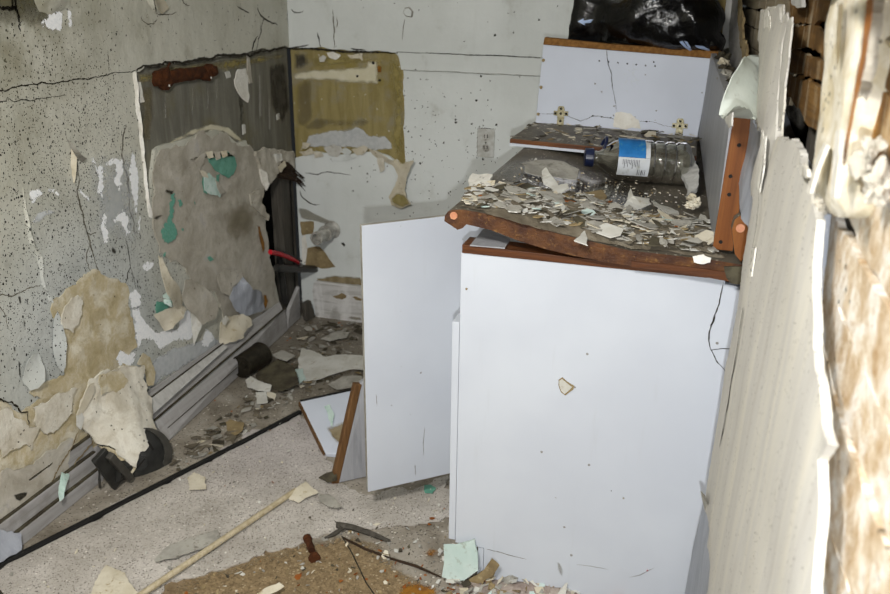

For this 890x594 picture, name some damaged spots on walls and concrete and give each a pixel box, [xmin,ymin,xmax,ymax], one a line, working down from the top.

crack [0,1,21,32]
crack [0,7,405,102]
peeling [327,52,363,61]
peeling [67,139,87,183]
flaking render [133,72,414,345]
flaking render [0,188,157,562]
peeling [256,392,268,404]